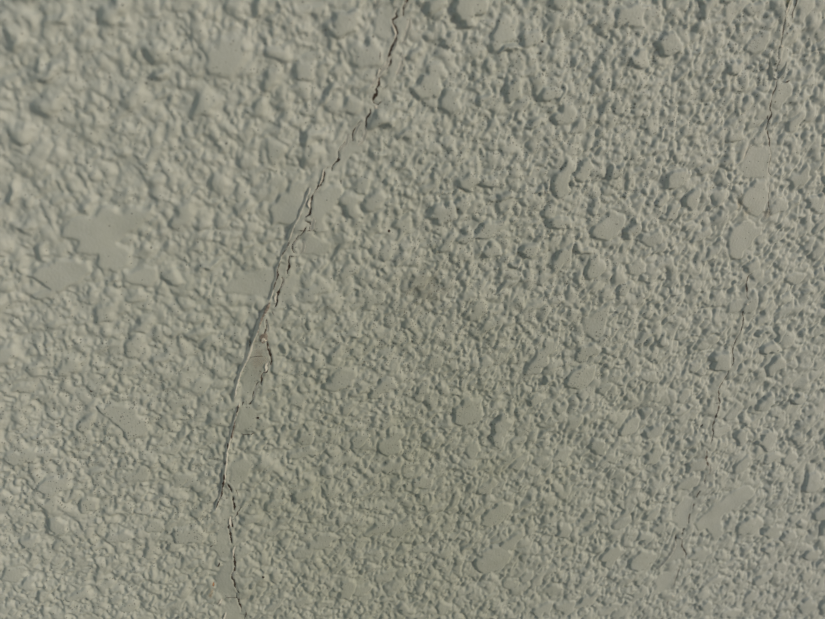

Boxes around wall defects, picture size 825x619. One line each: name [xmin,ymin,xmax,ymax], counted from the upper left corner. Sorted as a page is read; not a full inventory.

crack [242,0,411,405]
crack [743,0,798,230]
crack [210,485,247,619]
crack [662,273,752,619]